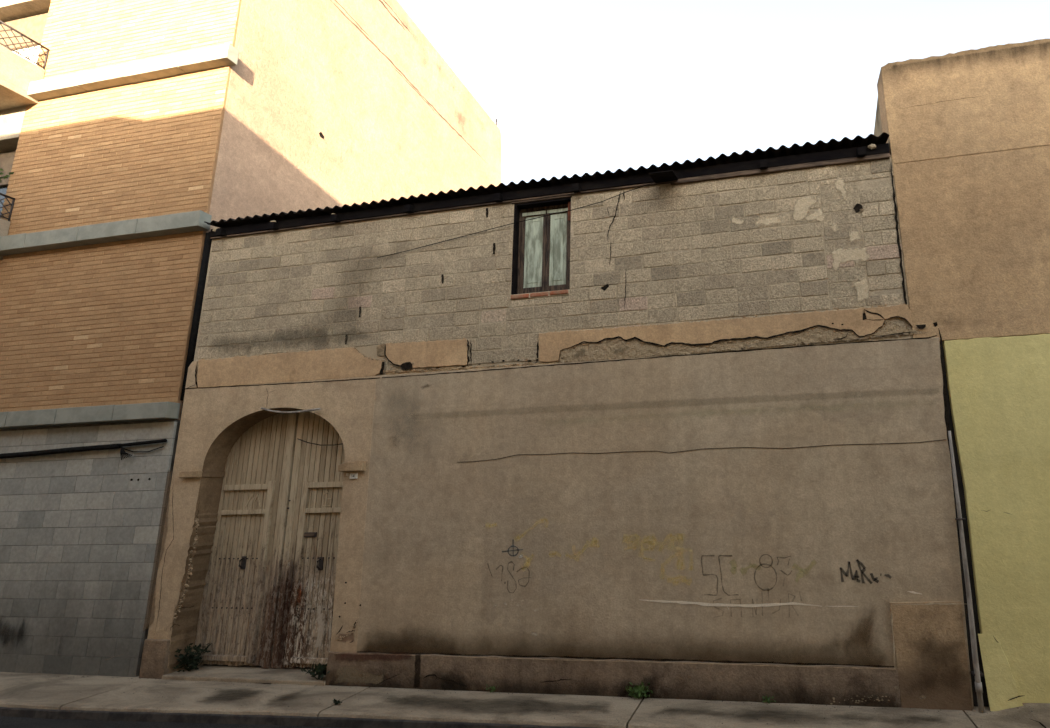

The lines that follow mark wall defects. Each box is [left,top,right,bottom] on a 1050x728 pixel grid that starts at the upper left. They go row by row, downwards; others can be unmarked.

crack [183,165,951,455]
spalling [345,320,938,375]